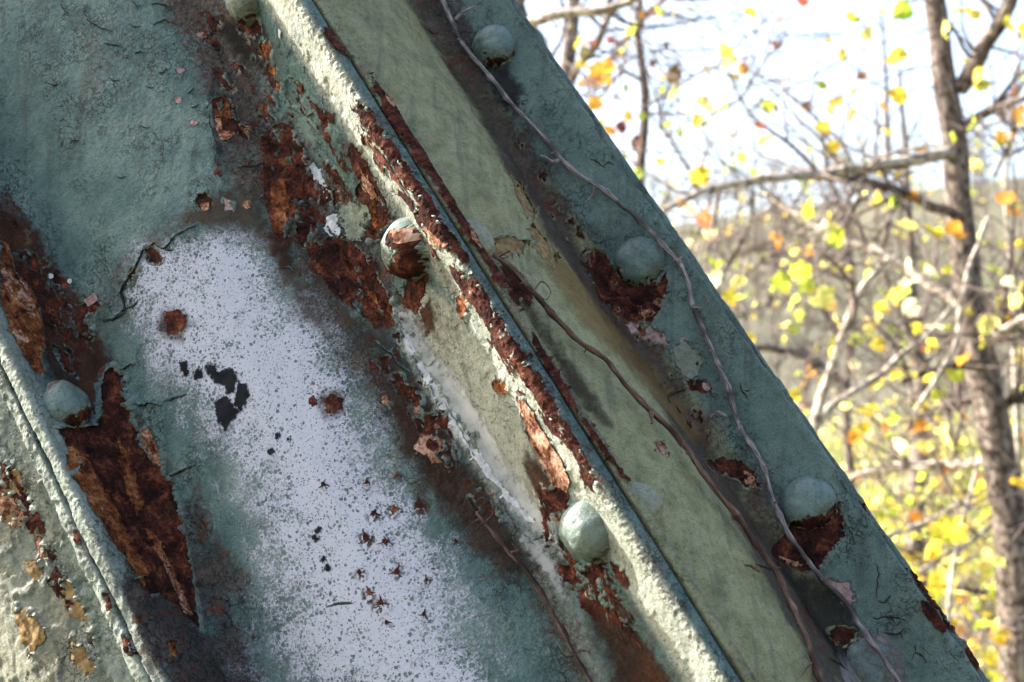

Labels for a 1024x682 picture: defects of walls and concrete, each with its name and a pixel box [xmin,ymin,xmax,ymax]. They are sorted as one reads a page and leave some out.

corrosion [0,212,142,444]
peeling [0,240,209,637]
corrosion [197,7,564,525]
peeling [188,72,634,622]
peeling [0,457,117,680]
peeling [119,629,141,659]
corrosion [523,454,669,682]